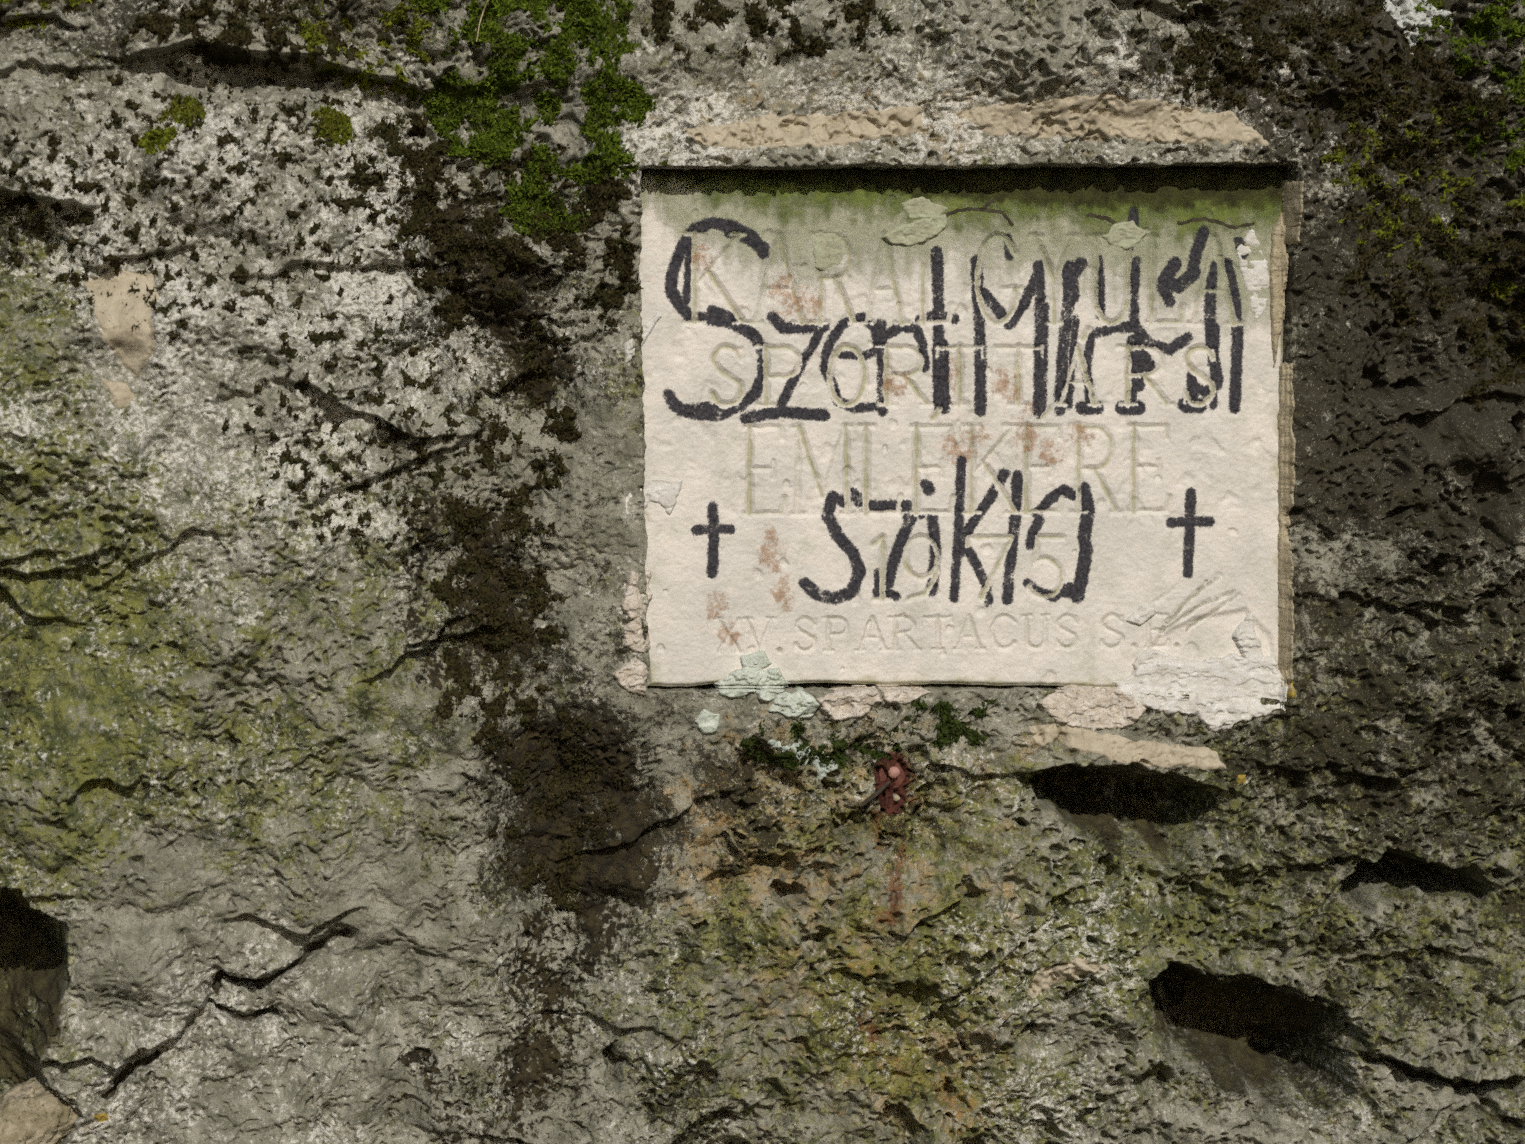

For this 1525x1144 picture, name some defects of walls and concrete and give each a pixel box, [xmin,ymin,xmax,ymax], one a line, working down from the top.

rust [872,751,916,926]
crack [211,928,349,1020]
crack [101,1051,160,1099]